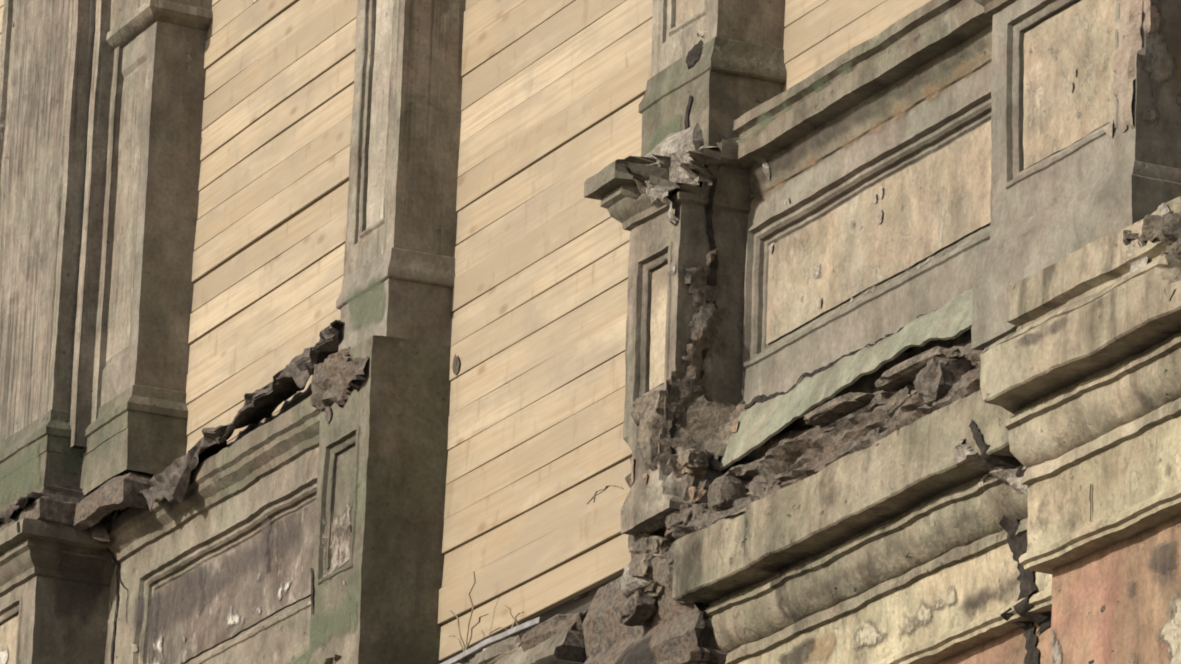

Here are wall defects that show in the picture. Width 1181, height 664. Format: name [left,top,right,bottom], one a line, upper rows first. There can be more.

spalling [1103,0,1176,138]
spalling [621,144,715,227]
spalling [1123,203,1181,279]
spalling [620,248,983,627]
crack [969,420,1025,478]
crack [106,548,128,664]
crack [307,568,315,614]
crack [999,514,1052,664]
peeling [1157,594,1181,664]